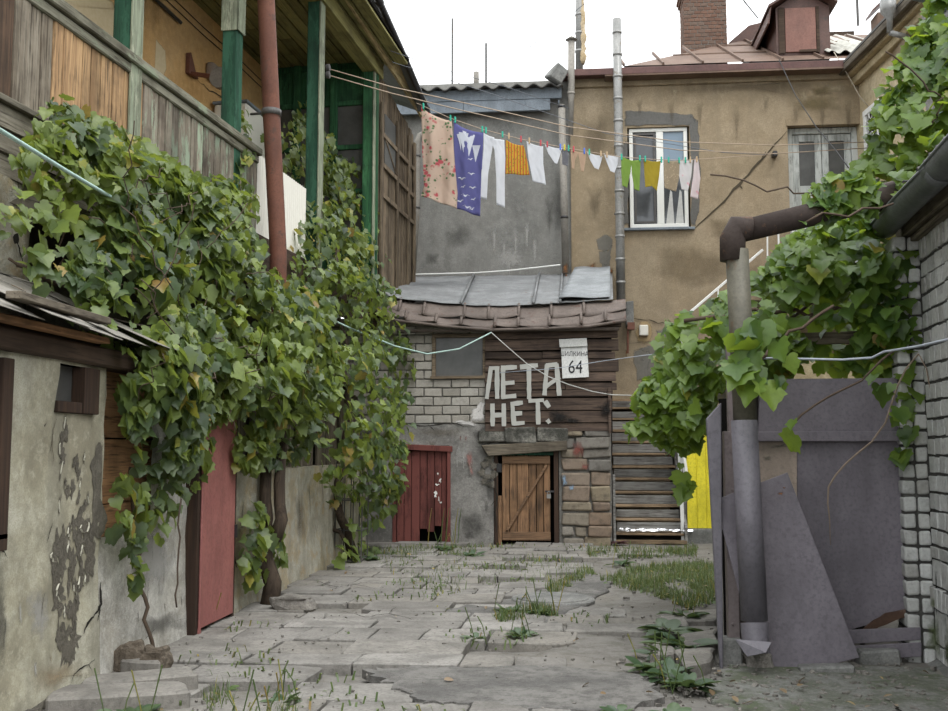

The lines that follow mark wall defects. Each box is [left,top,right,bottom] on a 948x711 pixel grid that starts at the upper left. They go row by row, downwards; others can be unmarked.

peeling [50,414,108,668]
crack [84,582,102,633]